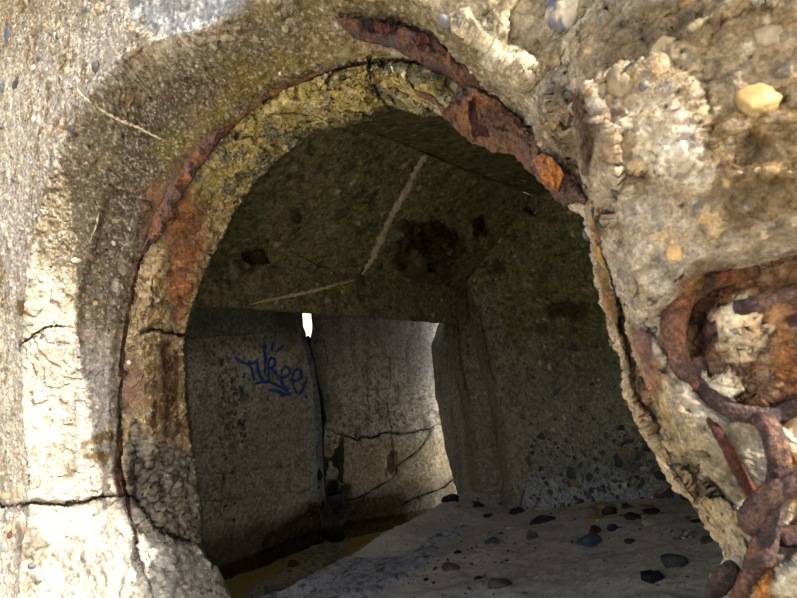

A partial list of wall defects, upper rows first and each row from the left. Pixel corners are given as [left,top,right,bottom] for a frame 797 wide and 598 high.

crack [598,57,651,85]
rust [160,191,207,321]
peeling [701,293,780,402]
rust [122,348,144,410]
crack [326,389,439,517]
crack [0,493,200,546]
crack [398,479,453,509]